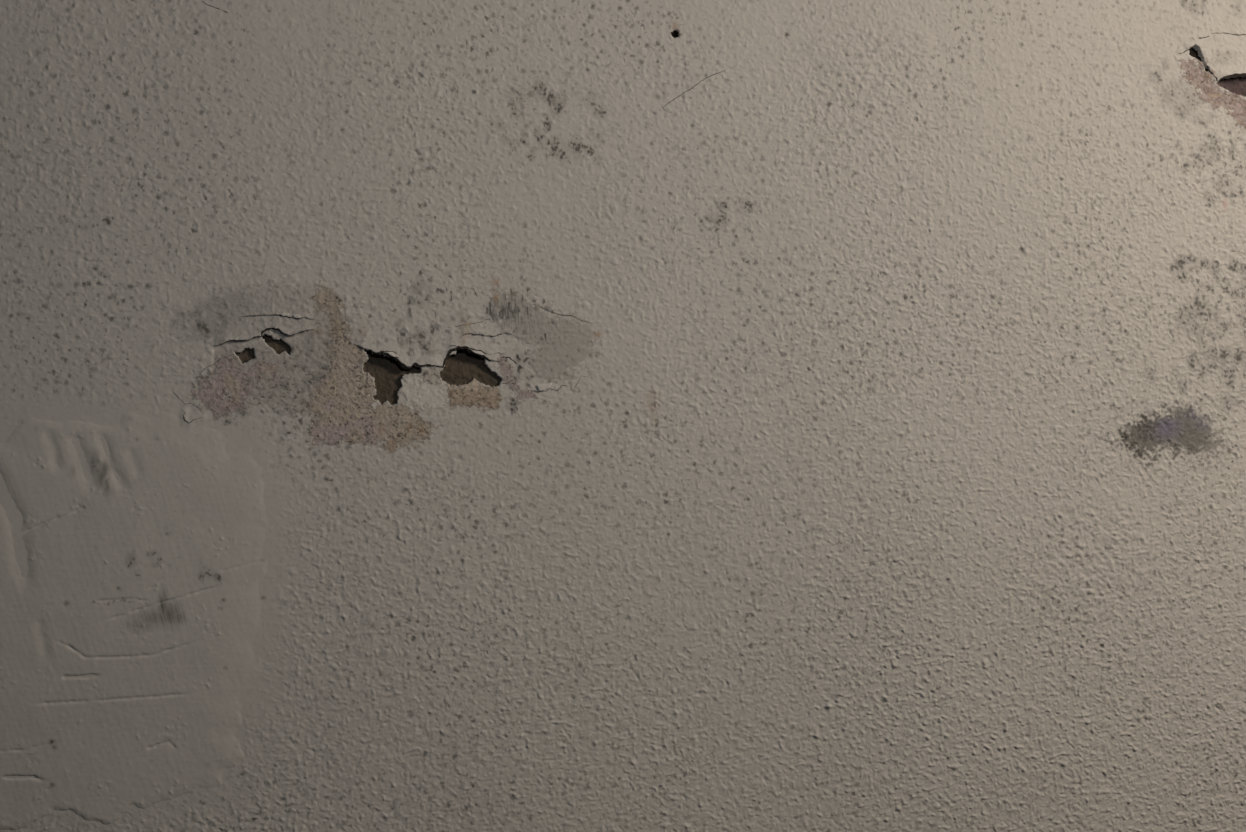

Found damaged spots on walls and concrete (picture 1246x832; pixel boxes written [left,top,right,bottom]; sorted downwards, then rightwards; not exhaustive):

peeling [1179,47,1246,133]
leakage [1171,257,1246,279]
peeling [191,284,552,452]
leakage [1180,286,1243,385]
leakage [1111,399,1215,466]